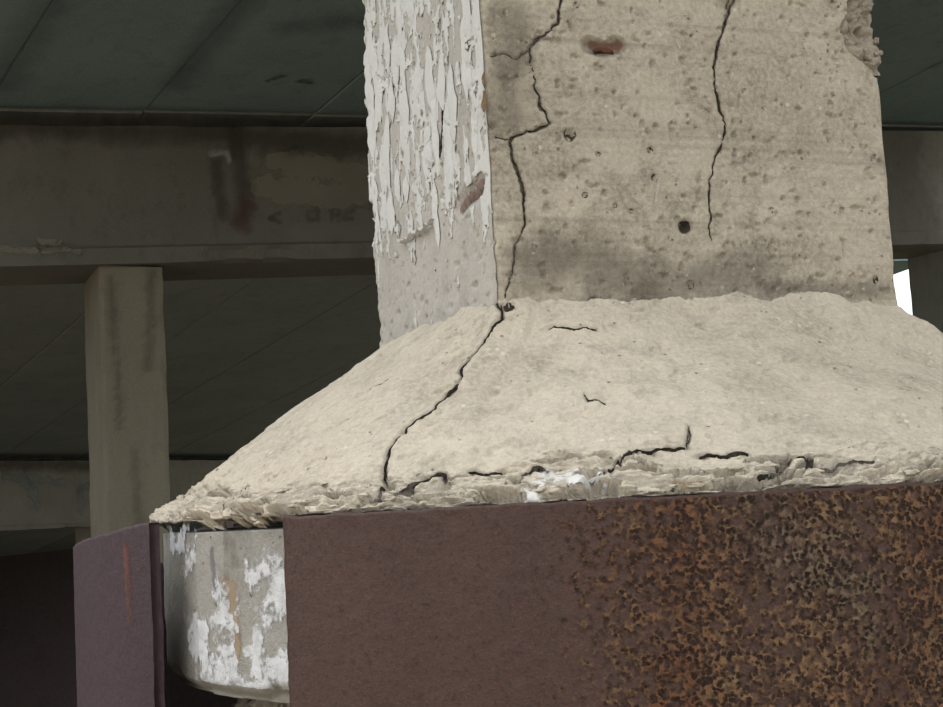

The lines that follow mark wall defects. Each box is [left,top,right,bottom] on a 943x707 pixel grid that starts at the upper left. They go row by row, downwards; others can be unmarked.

peeling [362,0,498,348]
crack [361,0,563,504]
crack [549,324,596,332]
corrosion [588,39,622,55]
crack [708,0,735,240]
spalling [839,0,883,78]
peeling [170,523,198,579]
peeling [187,549,290,707]
corrosion [570,485,943,707]